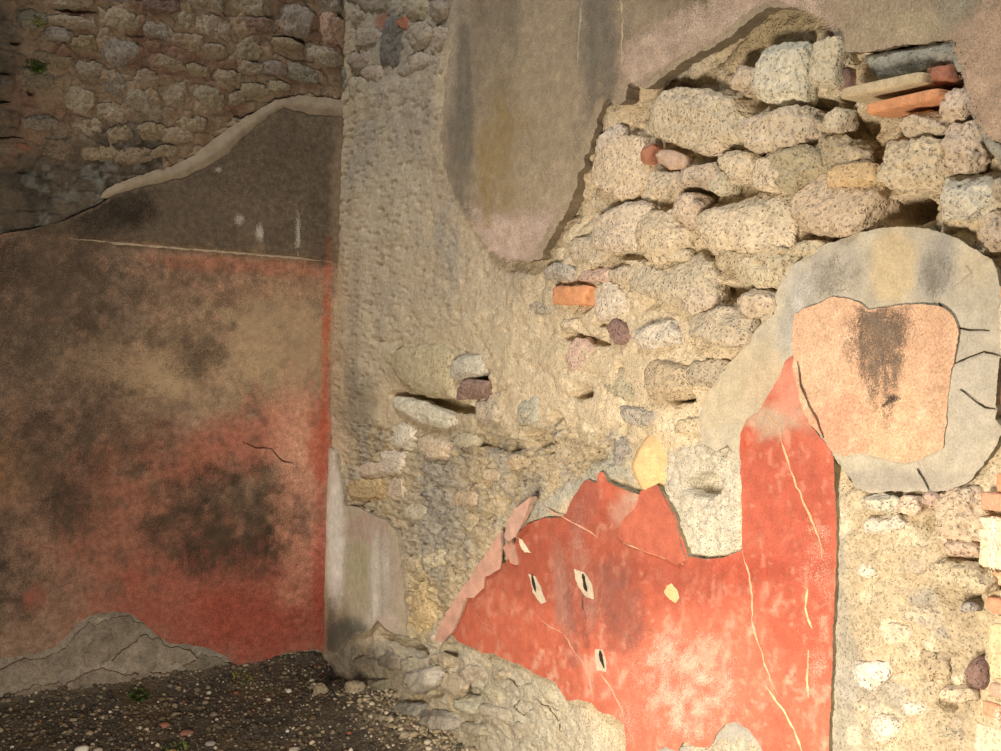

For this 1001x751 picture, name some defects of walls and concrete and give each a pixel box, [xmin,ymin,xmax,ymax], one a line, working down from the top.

spalling [8,0,451,187]
leakage [0,215,394,655]
crack [246,443,293,464]
spalling [343,0,1001,751]
crack [760,405,823,559]
leakage [774,251,867,365]
leakage [840,306,927,430]
crack [742,551,812,751]